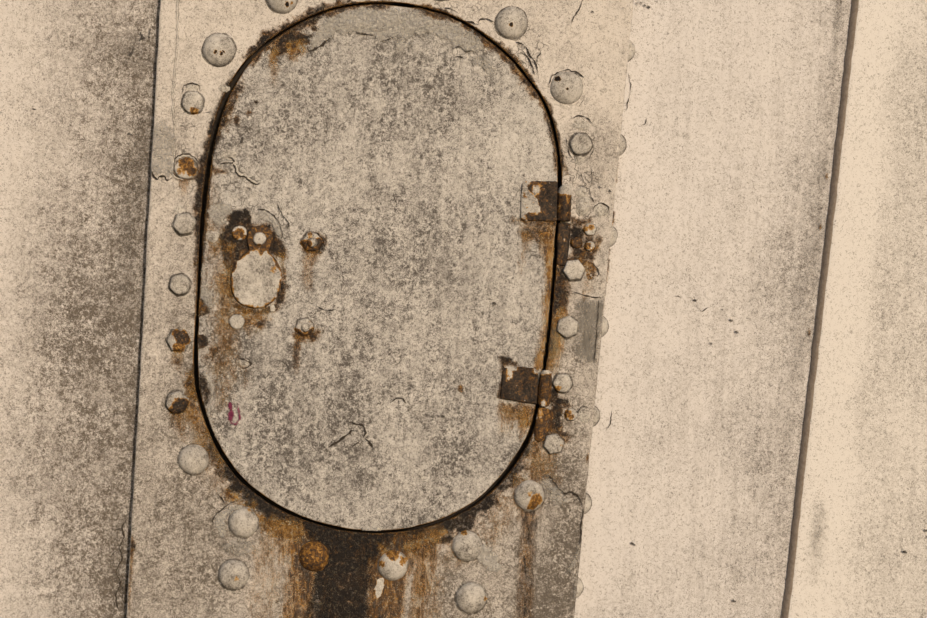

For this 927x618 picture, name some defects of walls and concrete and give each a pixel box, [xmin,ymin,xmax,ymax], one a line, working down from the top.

corrosion [242,0,390,66]
corrosion [182,79,286,373]
corrosion [293,330,320,367]
corrosion [303,233,327,262]
corrosion [511,217,610,371]
corrosion [174,356,571,618]